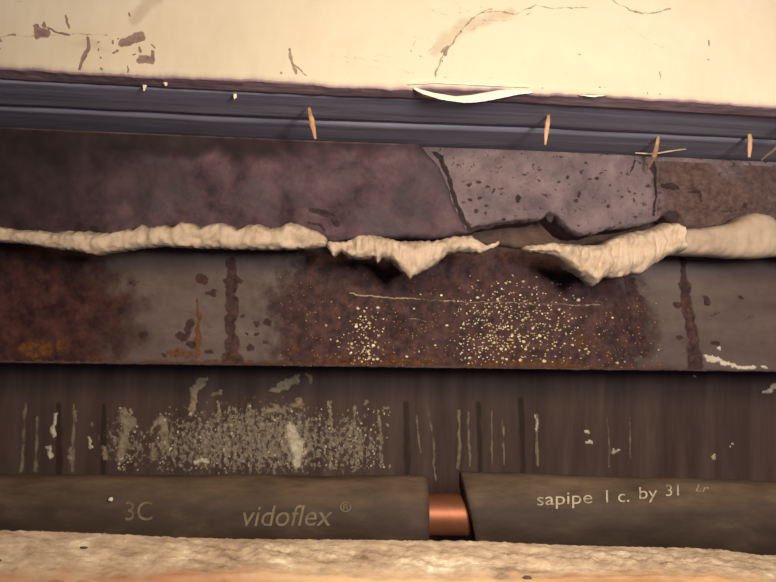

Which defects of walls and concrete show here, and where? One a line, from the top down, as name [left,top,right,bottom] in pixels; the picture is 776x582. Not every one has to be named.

peeling [33,15,70,39]
peeling [78,36,103,70]
peeling [112,32,155,64]
crack [435,9,508,75]
crack [432,151,522,233]
crack [630,160,702,216]
corrosion [0,243,148,362]
corrosion [143,246,658,369]
corrosion [673,256,702,369]
water stain [88,373,391,475]